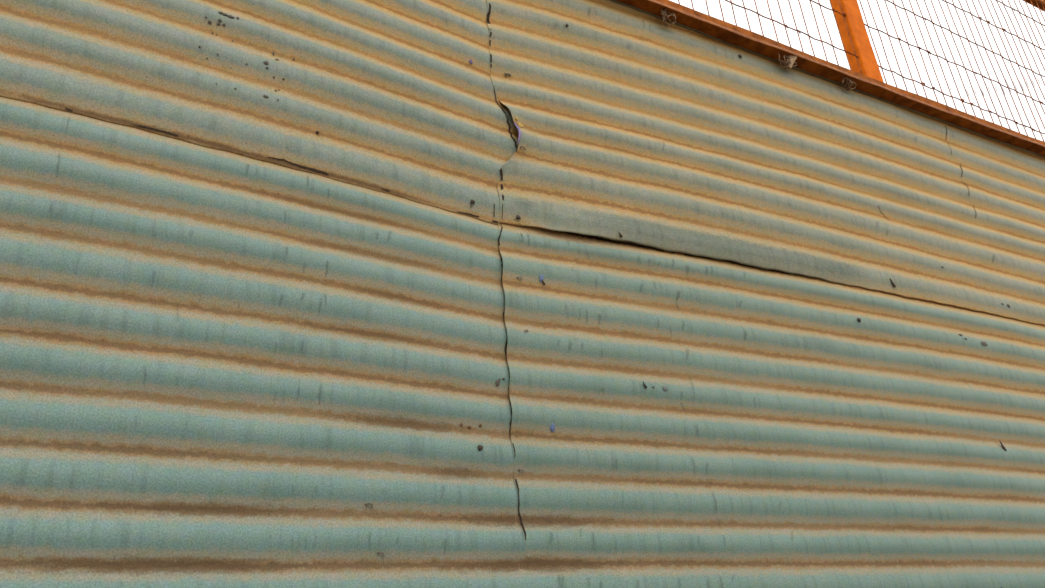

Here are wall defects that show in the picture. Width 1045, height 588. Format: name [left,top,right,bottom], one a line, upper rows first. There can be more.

crack [486,3,518,149]
crack [133,124,178,136]
crack [267,157,329,175]
crack [457,168,515,280]
crack [556,231,814,278]
crack [503,305,515,453]
crack [515,479,526,540]